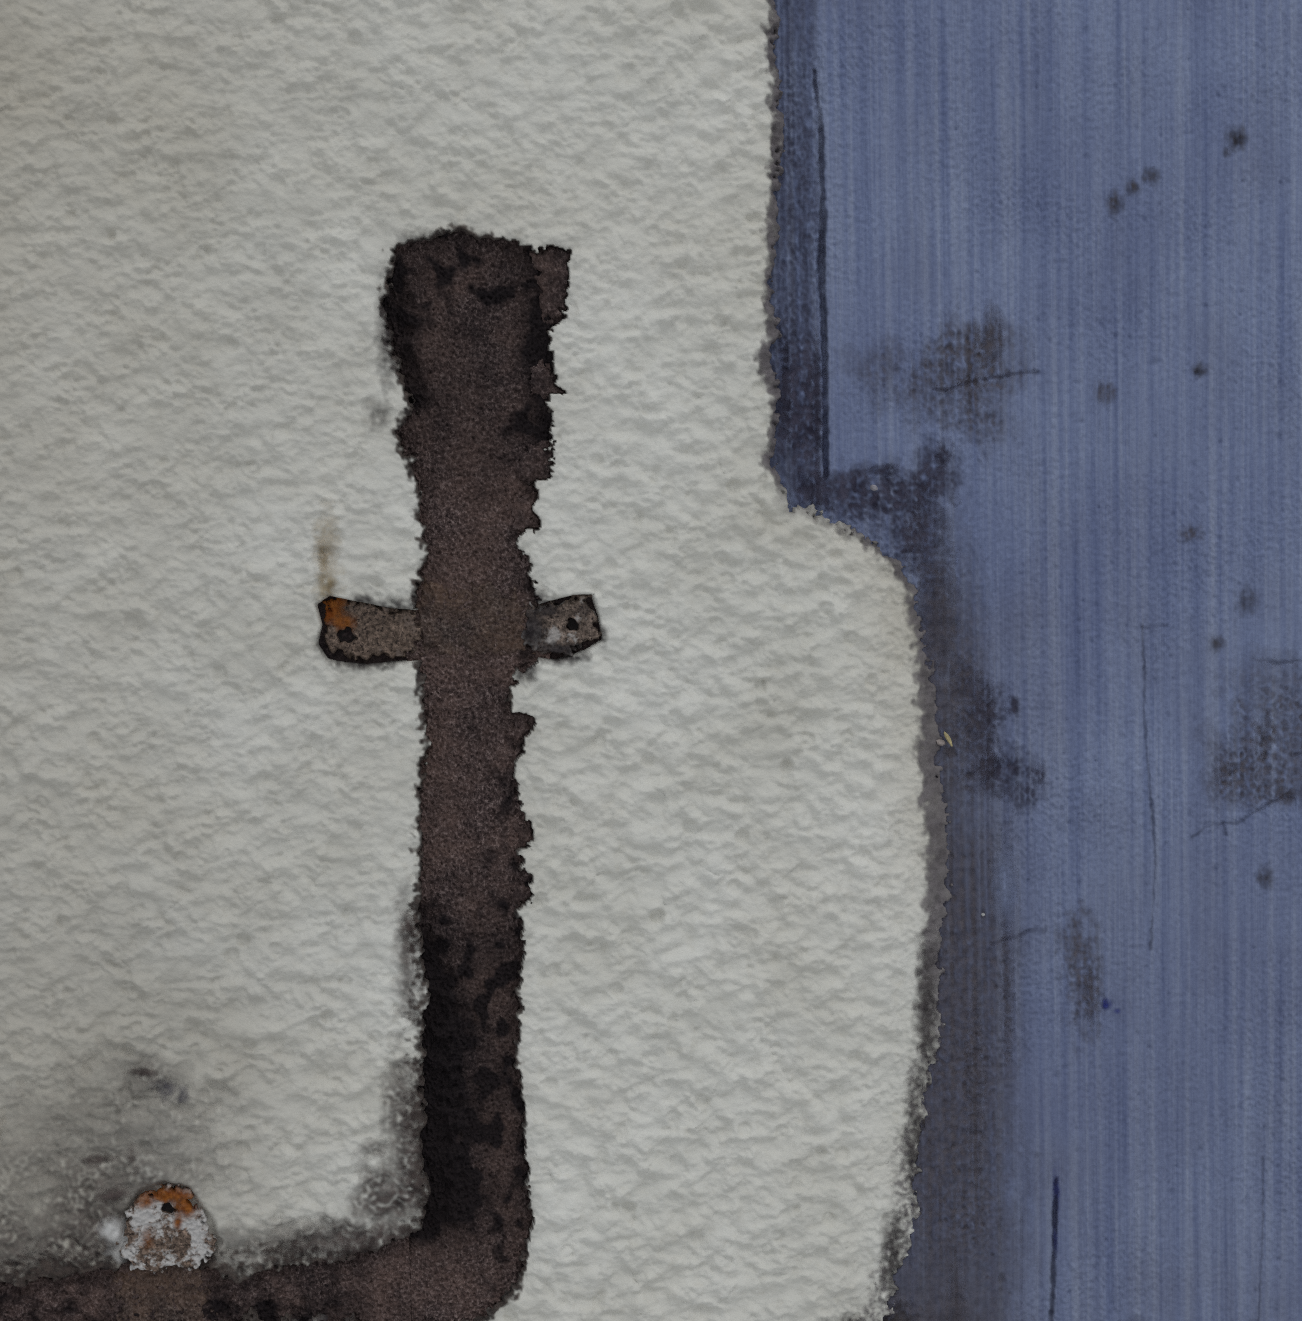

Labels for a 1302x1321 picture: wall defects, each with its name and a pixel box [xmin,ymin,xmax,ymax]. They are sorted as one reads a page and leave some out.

peeling [758,0,786,487]
corrosion [321,579,351,628]
peeling [838,526,953,1321]
corrosion [139,1185,198,1228]